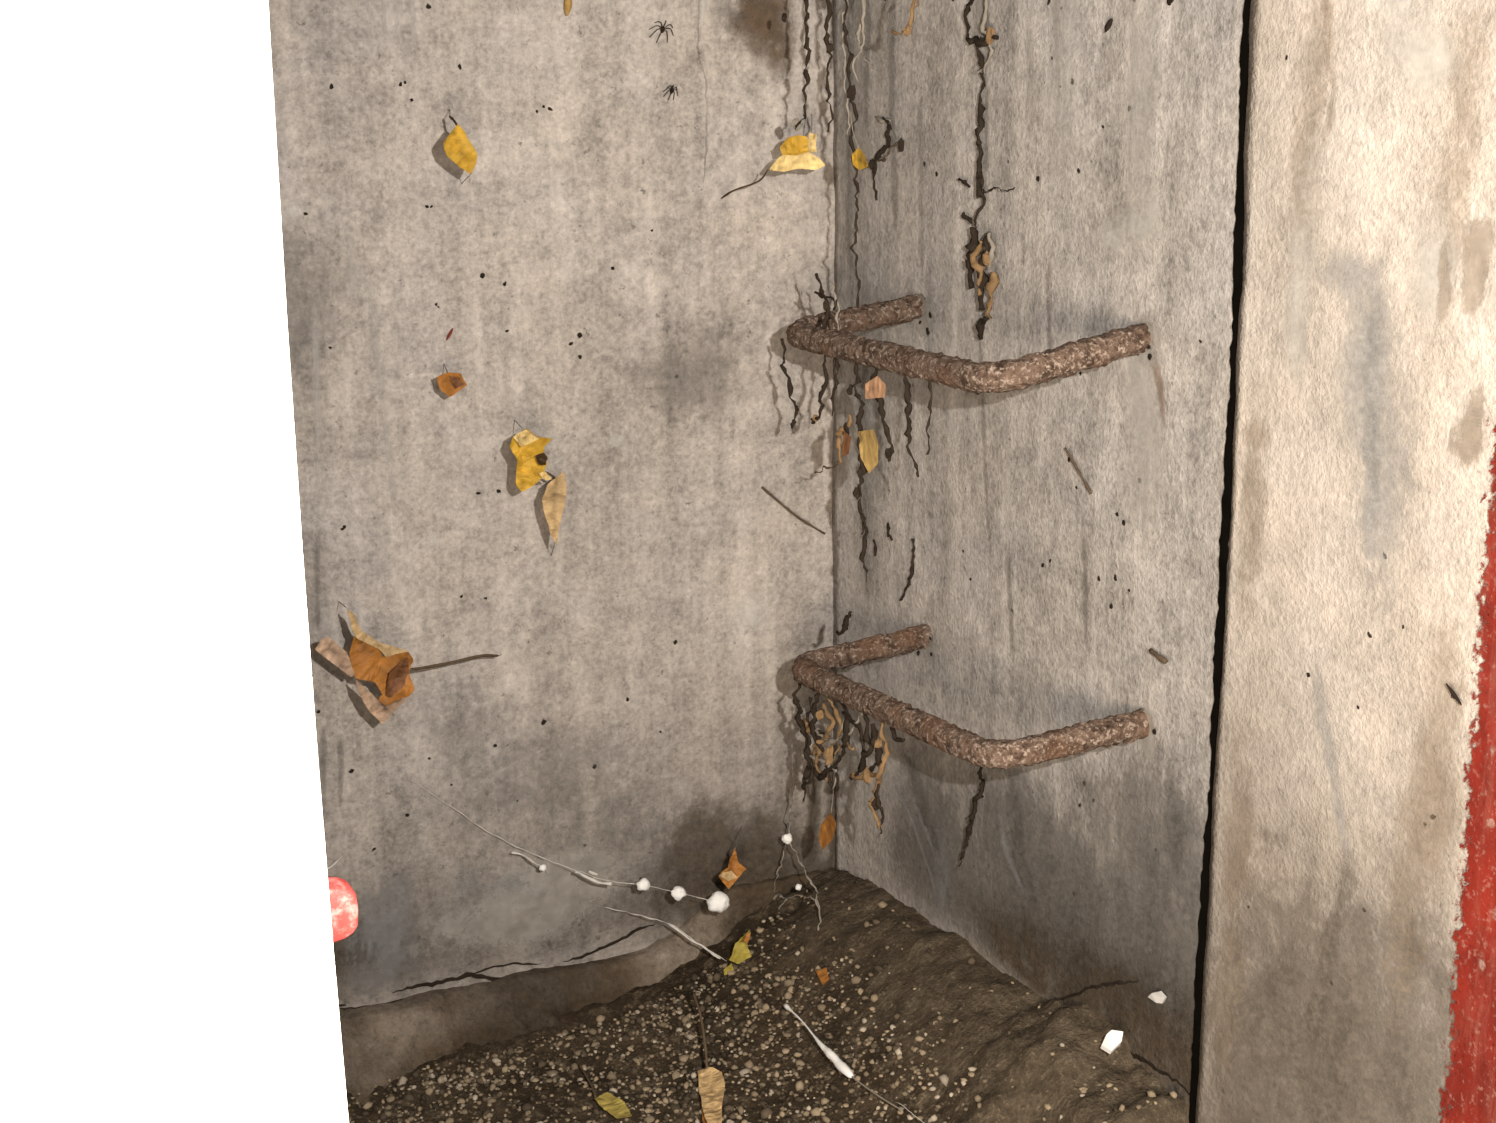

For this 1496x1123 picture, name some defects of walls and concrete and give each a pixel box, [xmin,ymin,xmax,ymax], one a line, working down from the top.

corrosion [734,0,789,67]
crack [1130,0,1251,1123]
damp [665,748,836,920]
crack [338,924,655,1010]
crack [1059,980,1139,1001]